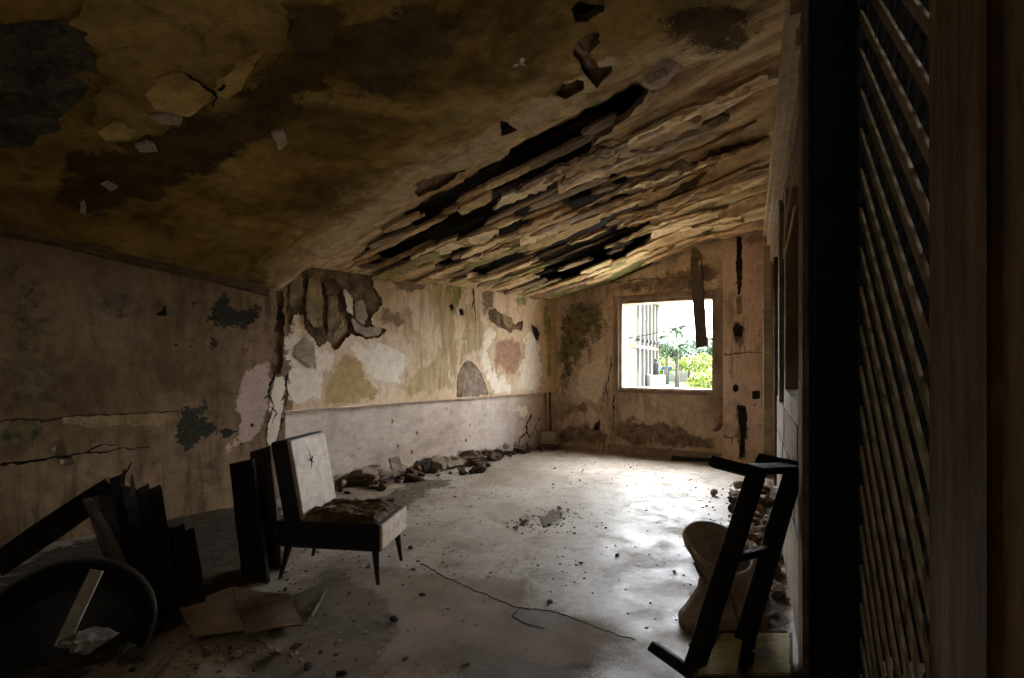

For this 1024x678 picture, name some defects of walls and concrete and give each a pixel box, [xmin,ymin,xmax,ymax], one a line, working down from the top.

flaking render [0,0,290,153]
spalling [556,1,612,99]
spalling [415,169,465,197]
flaking render [487,71,778,266]
water stain [657,143,746,203]
crack [0,444,150,466]
crack [0,409,199,423]
crack [264,372,288,446]
spalling [225,267,409,454]
flaking render [456,308,544,418]
water stain [556,296,716,449]
crack [421,564,635,641]